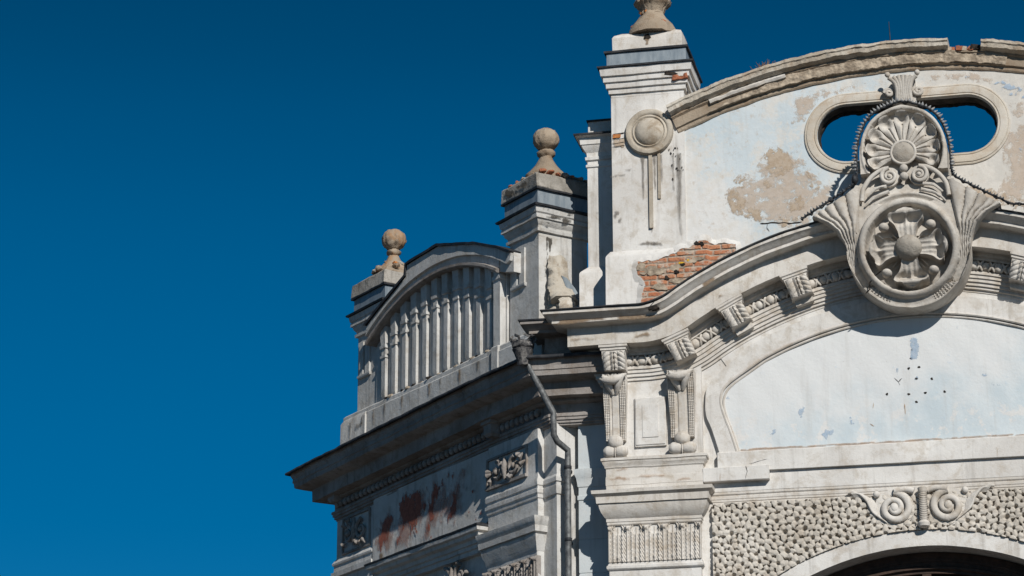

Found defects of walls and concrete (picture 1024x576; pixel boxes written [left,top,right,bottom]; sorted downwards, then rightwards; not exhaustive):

spalling [708,44,1024,210]
peeling [726,147,835,227]
flaking render [631,234,742,303]